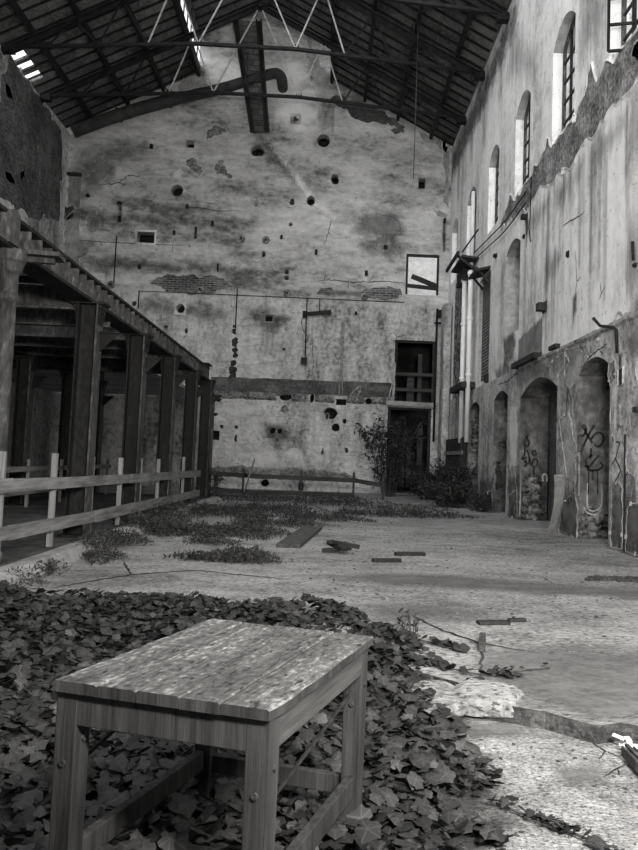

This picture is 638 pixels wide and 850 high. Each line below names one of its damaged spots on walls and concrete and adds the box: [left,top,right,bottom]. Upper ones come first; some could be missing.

spalling [305,37,406,135]
spalling [0,55,101,265]
spalling [167,181,189,209]
peeling [184,123,233,180]
spalling [416,129,451,220]
spalling [500,28,638,230]
water stain [359,214,402,254]
spalling [148,273,234,315]
spalling [358,285,403,301]
peeling [610,403,622,443]
spalling [557,412,638,557]